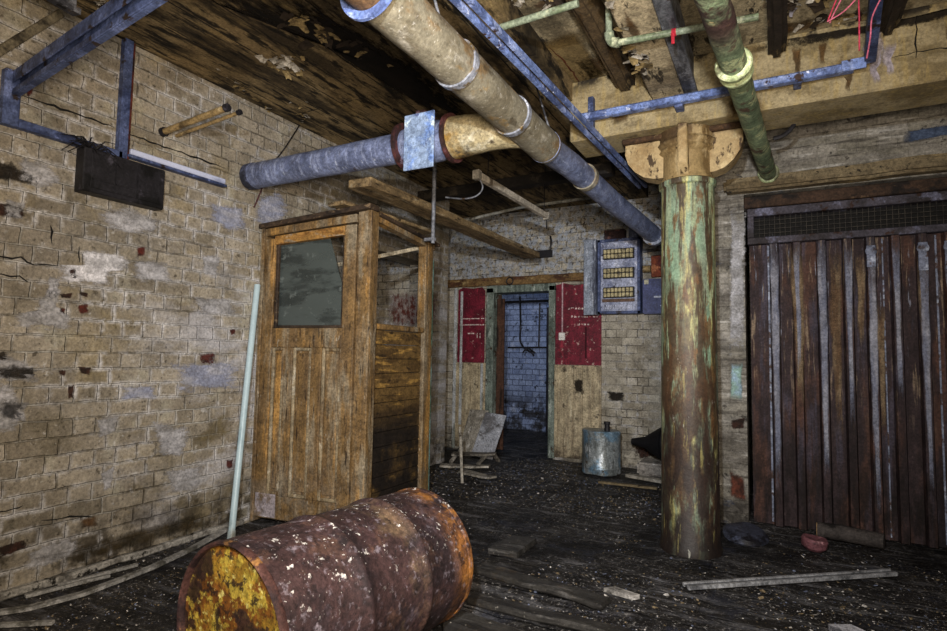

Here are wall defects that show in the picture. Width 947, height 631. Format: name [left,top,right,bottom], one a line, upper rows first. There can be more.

crack [0,226,80,282]
peeling [730,215,746,346]
peeling [0,352,37,431]
peeling [731,365,742,398]
water stain [79,516,202,559]